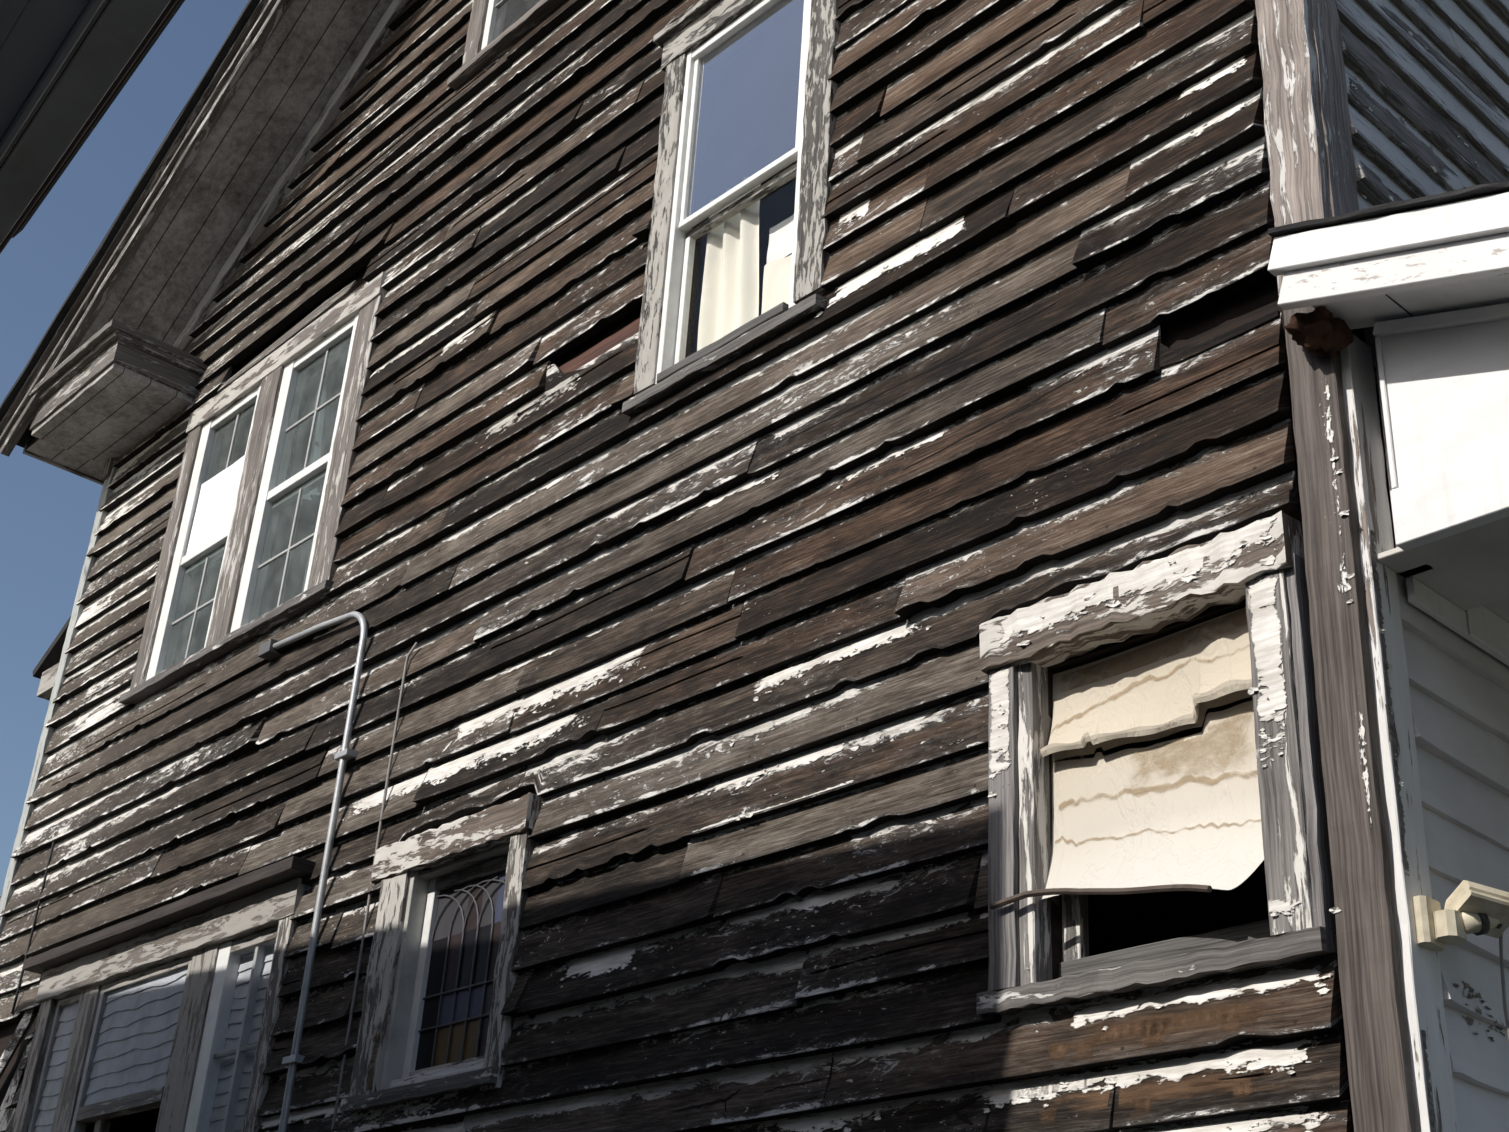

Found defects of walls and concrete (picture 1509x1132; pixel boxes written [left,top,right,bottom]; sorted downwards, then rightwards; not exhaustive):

peeling [835,198,870,234]
peeling [815,216,966,318]
peeling [753,623,932,701]
peeling [998,516,1287,767]
peeling [341,642,652,821]
peeling [710,720,774,752]
peeling [708,743,859,795]
peeling [988,669,1011,797]
peeling [1268,899,1341,916]
peeling [1070,969,1334,1030]
peeling [983,1035,1327,1113]
peeling [1141,1112,1336,1132]